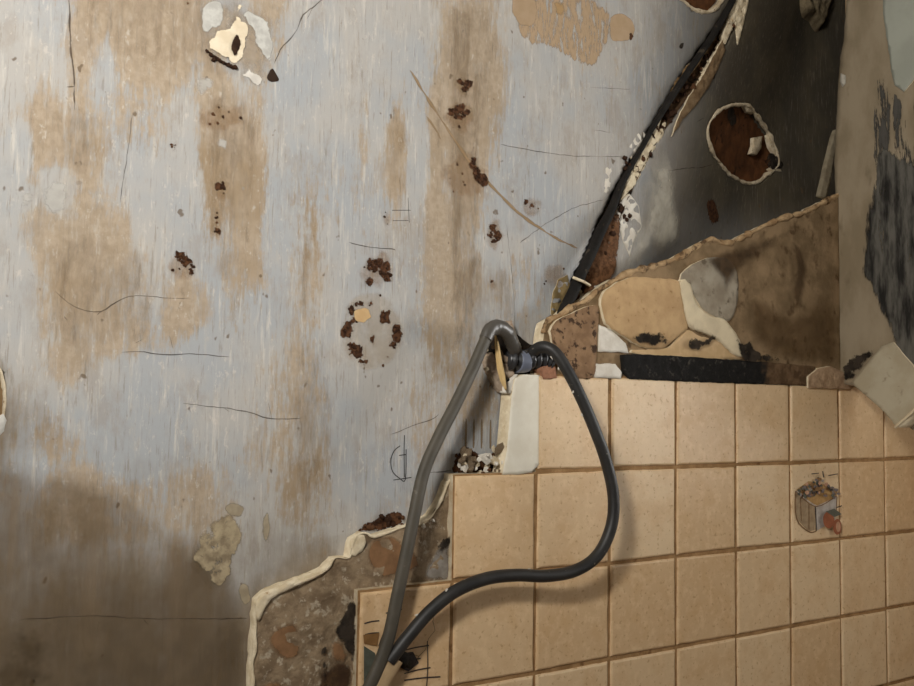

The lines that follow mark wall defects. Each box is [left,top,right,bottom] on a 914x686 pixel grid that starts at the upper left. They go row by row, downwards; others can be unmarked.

spalling [202,1,279,85]
crack [274,0,321,63]
peeling [512,0,635,66]
spalling [680,0,724,14]
spalling [706,102,783,185]
spalling [541,193,839,334]
leakage [863,80,914,364]
peeling [193,503,244,586]
peeling [407,479,450,583]
peeling [239,523,406,686]